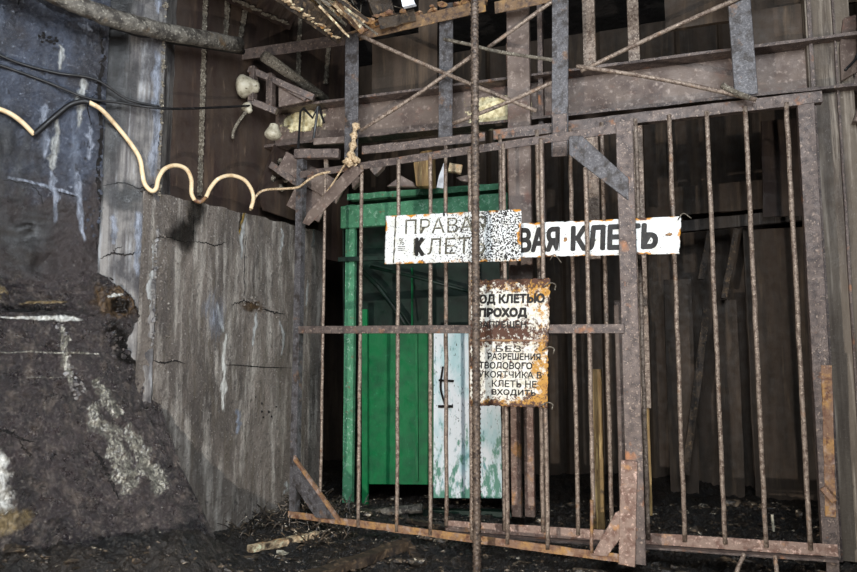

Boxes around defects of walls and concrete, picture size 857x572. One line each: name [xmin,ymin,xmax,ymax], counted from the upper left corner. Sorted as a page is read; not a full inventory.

crack [3,28,177,259]
water stain [213,305,227,410]
crack [233,300,283,314]